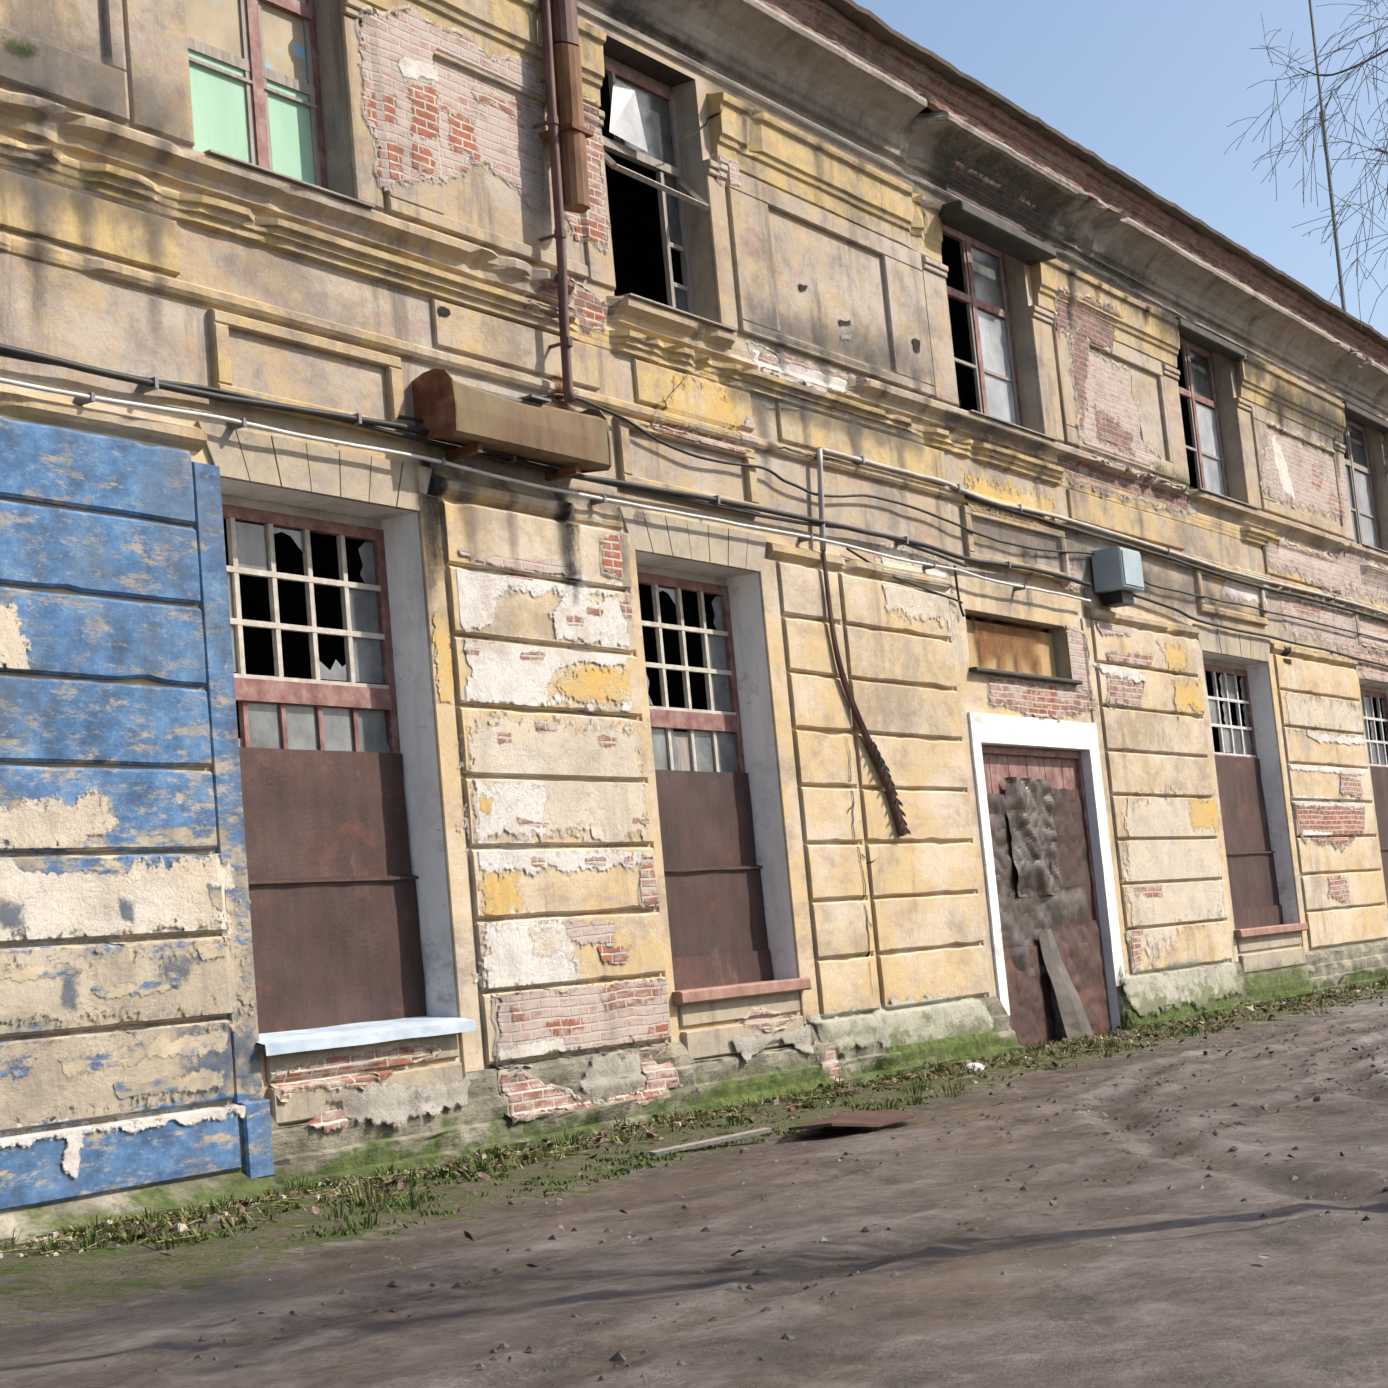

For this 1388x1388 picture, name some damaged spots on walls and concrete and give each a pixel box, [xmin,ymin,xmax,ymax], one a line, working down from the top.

flaking render [354,4,547,213]
flaking render [564,92,611,254]
corrosion [552,375,573,411]
flaking render [1051,285,1198,520]
flaking render [1259,419,1347,522]
peeling [0,602,32,676]
peeling [444,531,659,911]
flaking render [985,618,1153,723]
flaking render [1222,534,1388,683]
peeling [0,789,442,1178]
corrosion [239,747,427,1034]
flaking render [471,905,683,1125]